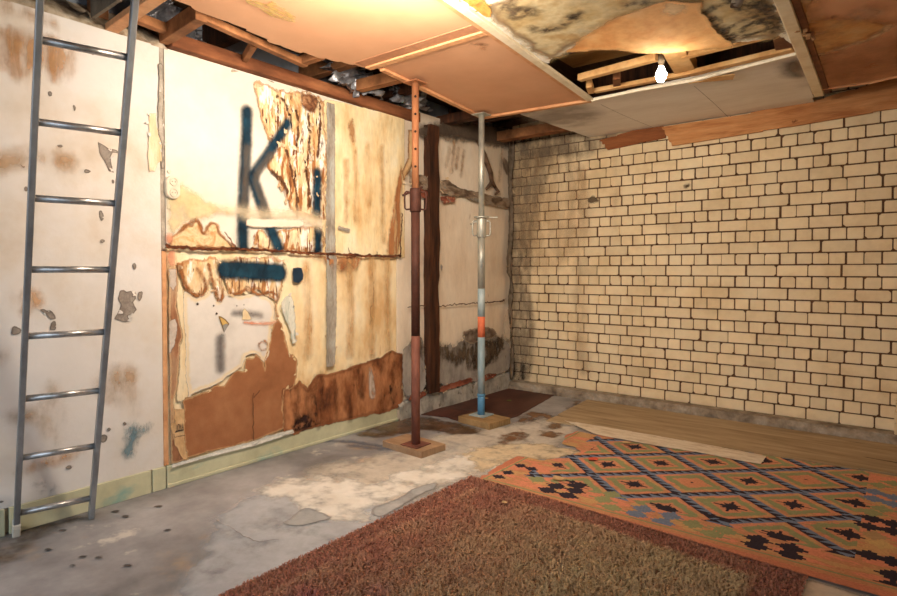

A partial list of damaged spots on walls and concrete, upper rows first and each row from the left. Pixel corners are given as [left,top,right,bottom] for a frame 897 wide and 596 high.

damp [489,0,784,59]
peeling [566,0,733,54]
damp [785,61,802,77]
damp [801,0,897,82]
peeling [98,142,118,183]
peeling [234,80,428,266]
spalling [440,177,510,208]
damp [419,121,592,380]
peeling [115,290,143,322]
peeling [168,256,298,468]
damp [282,350,403,435]
damp [325,417,478,450]